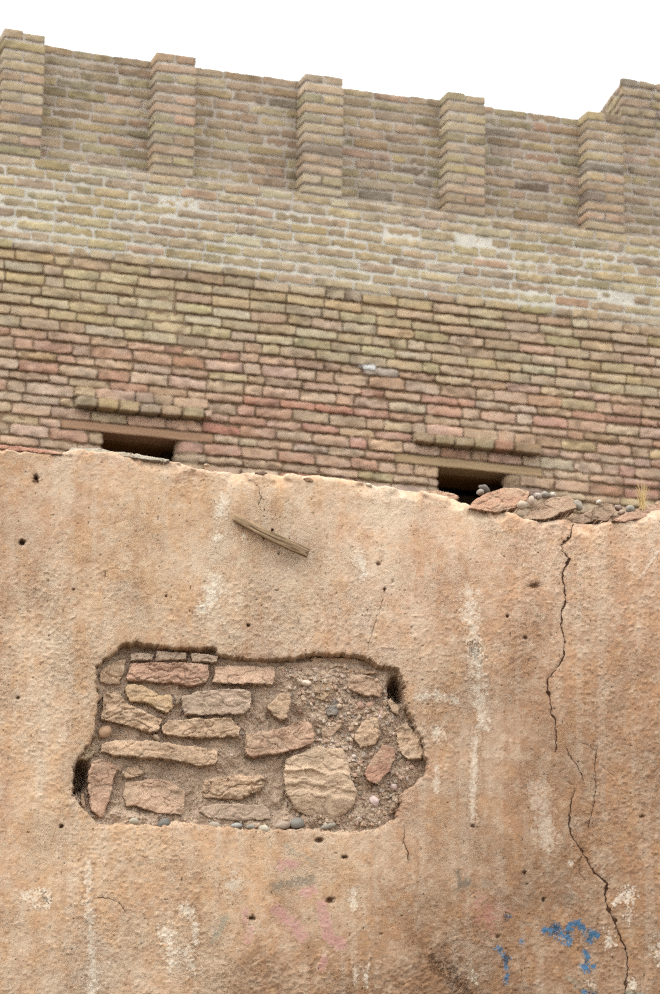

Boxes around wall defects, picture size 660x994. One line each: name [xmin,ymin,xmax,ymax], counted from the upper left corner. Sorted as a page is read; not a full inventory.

spalling [73,646,425,843]
crack [546,524,629,994]